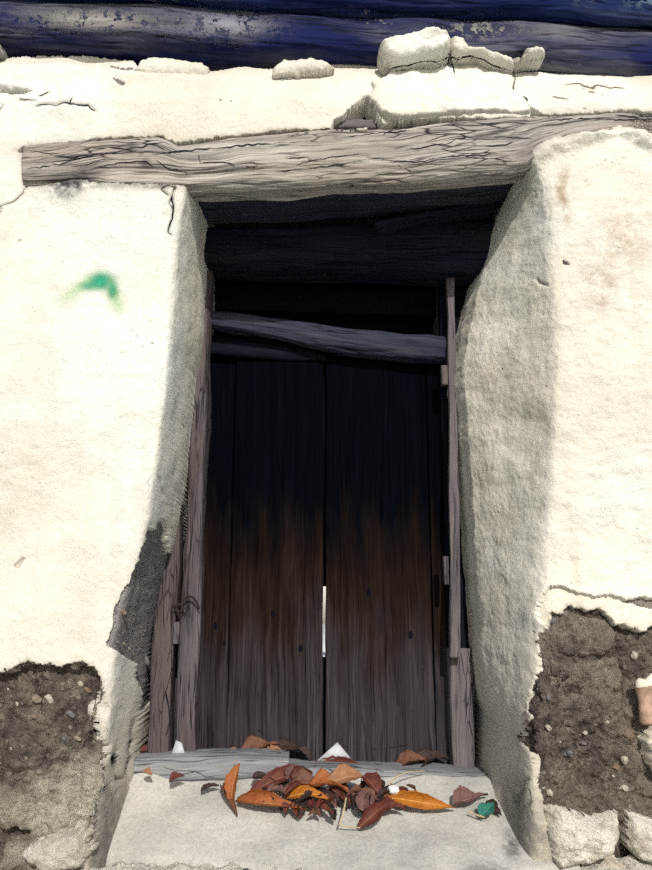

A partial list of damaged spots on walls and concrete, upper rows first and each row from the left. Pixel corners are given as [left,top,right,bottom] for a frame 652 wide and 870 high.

crack [21,92,94,111]
crack [381,53,528,101]
crack [548,83,652,121]
crack [31,126,533,235]
flaking render [107,522,168,706]
flaking render [0,661,107,870]
flaking render [517,587,652,858]